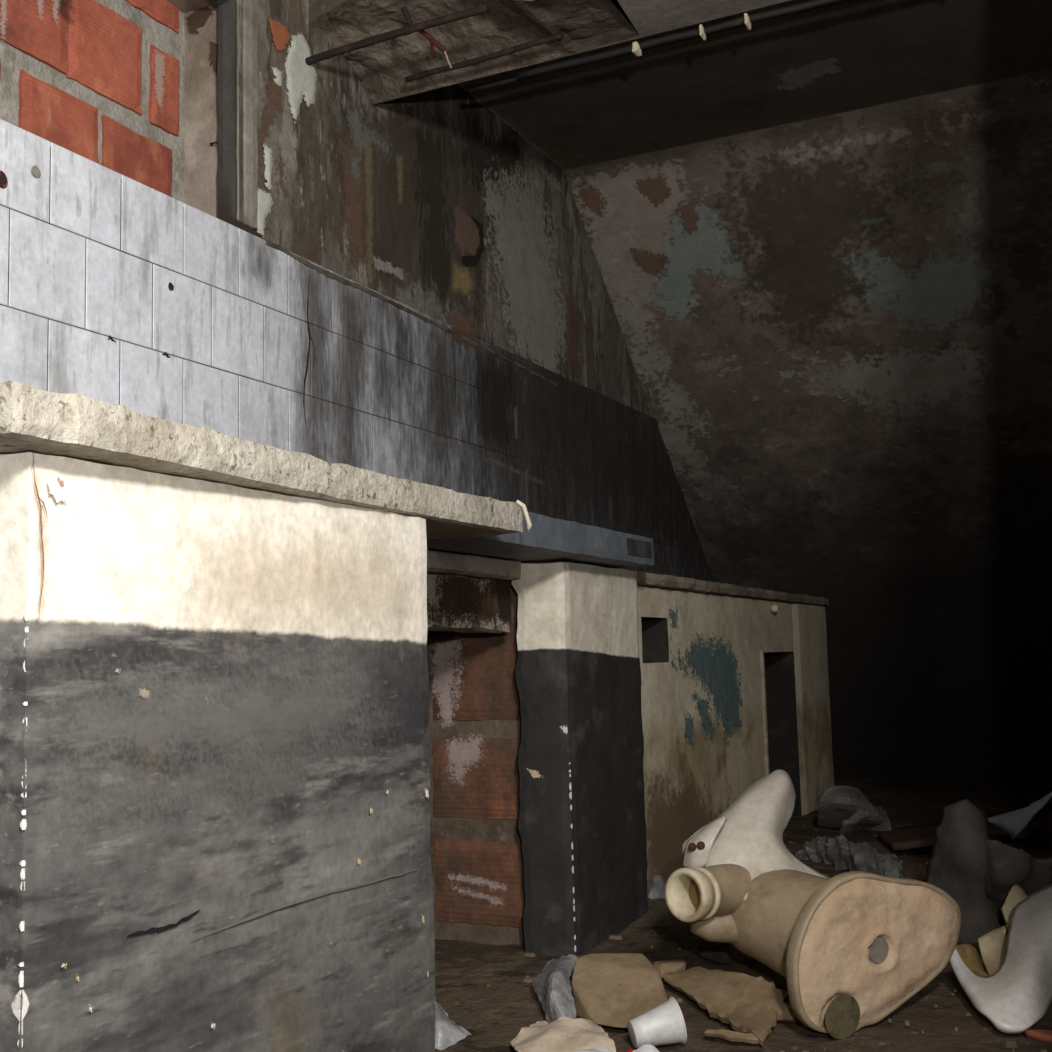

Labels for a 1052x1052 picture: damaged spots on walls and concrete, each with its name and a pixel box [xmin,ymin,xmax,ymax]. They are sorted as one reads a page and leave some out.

spalling [269,0,570,124]
water stain [332,106,721,466]
water stain [715,146,903,346]
crack [33,451,48,615]
peeling [668,606,678,630]
peeling [668,629,744,750]